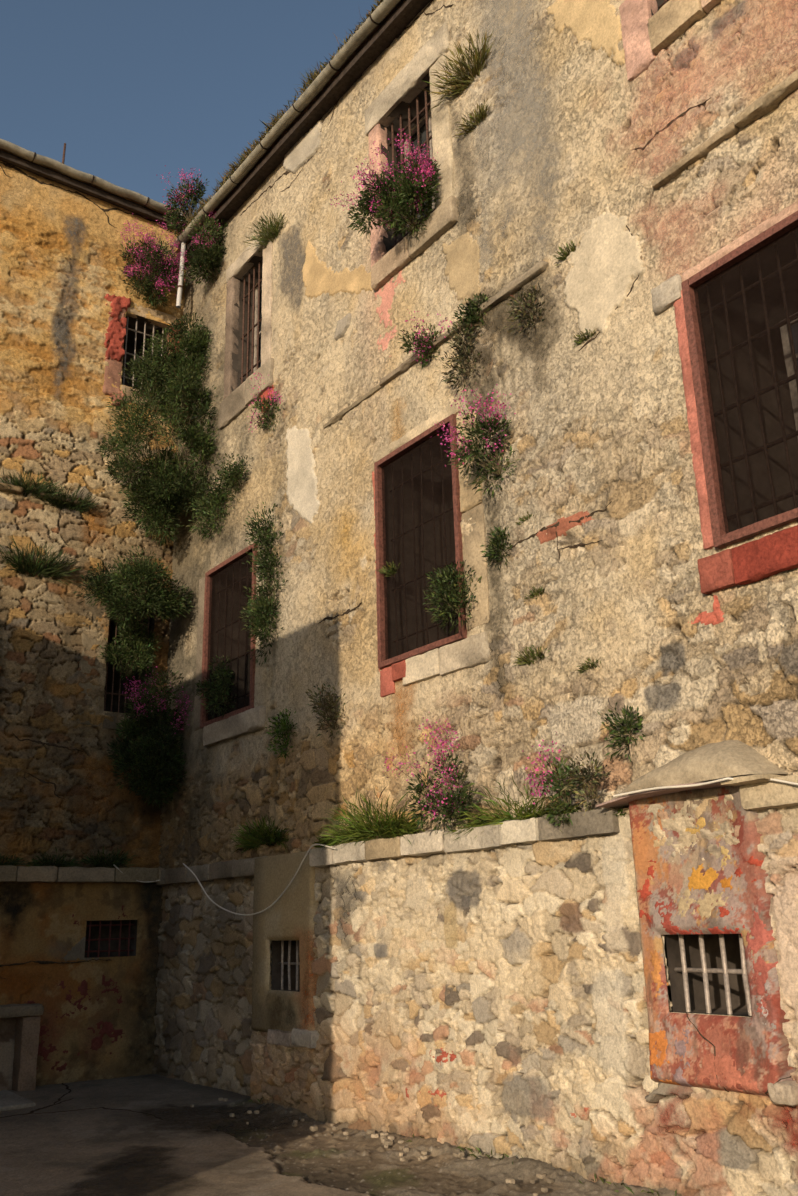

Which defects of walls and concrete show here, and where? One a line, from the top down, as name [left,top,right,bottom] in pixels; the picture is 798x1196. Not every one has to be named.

flaking render [546,0,625,66]
water stain [54,218,84,385]
peeling [104,294,131,362]
flaking render [302,240,405,357]
flaking render [563,206,646,337]
flaking render [285,425,321,524]
flaking render [536,511,594,544]
crack [0,959,110,979]
peeling [636,817,778,1029]
peeling [36,975,125,1072]
peeling [649,1027,760,1126]